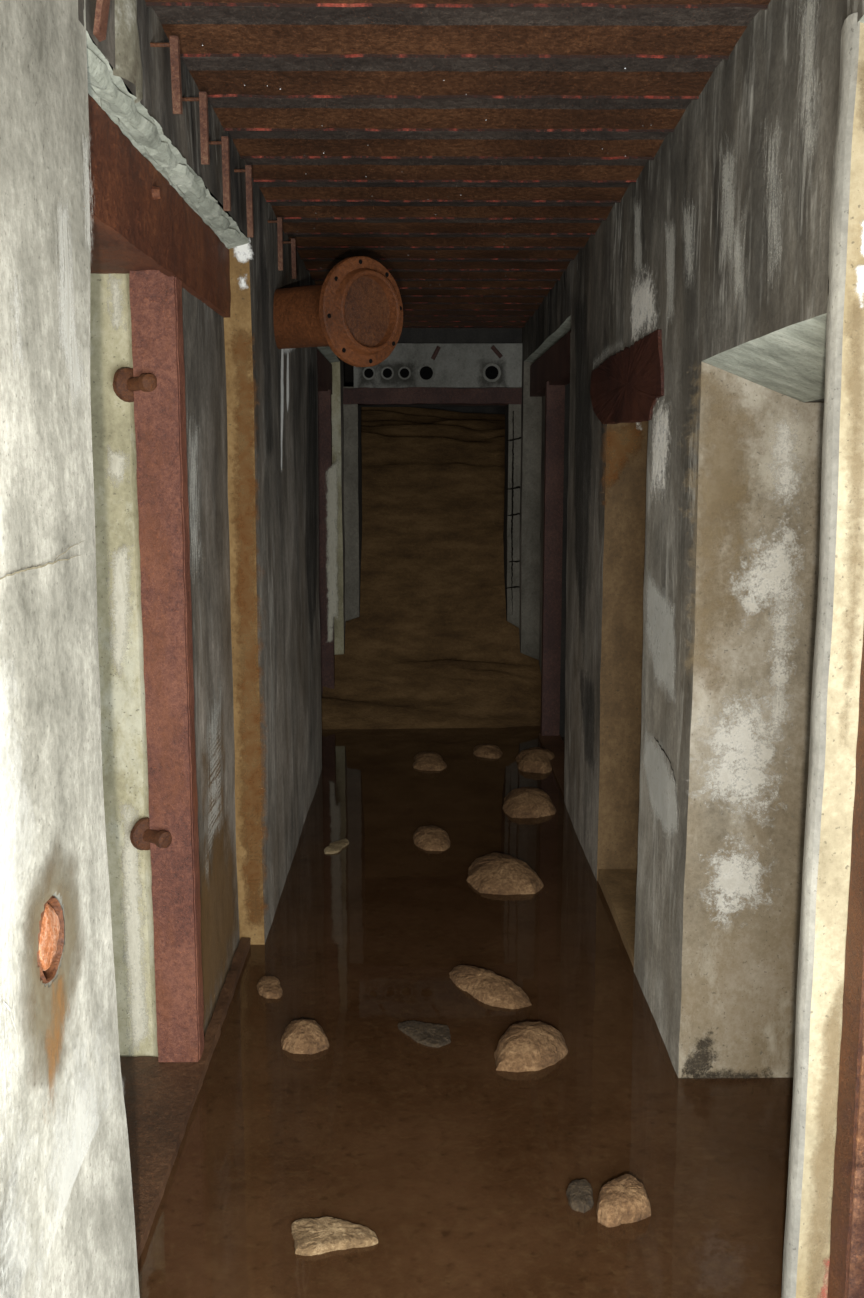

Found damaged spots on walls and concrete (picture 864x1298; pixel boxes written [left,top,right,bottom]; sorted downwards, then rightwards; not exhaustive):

damp [856,221,864,307]
damp [691,420,807,924]
rust [27,853,80,1083]
damp [685,1032,773,1079]